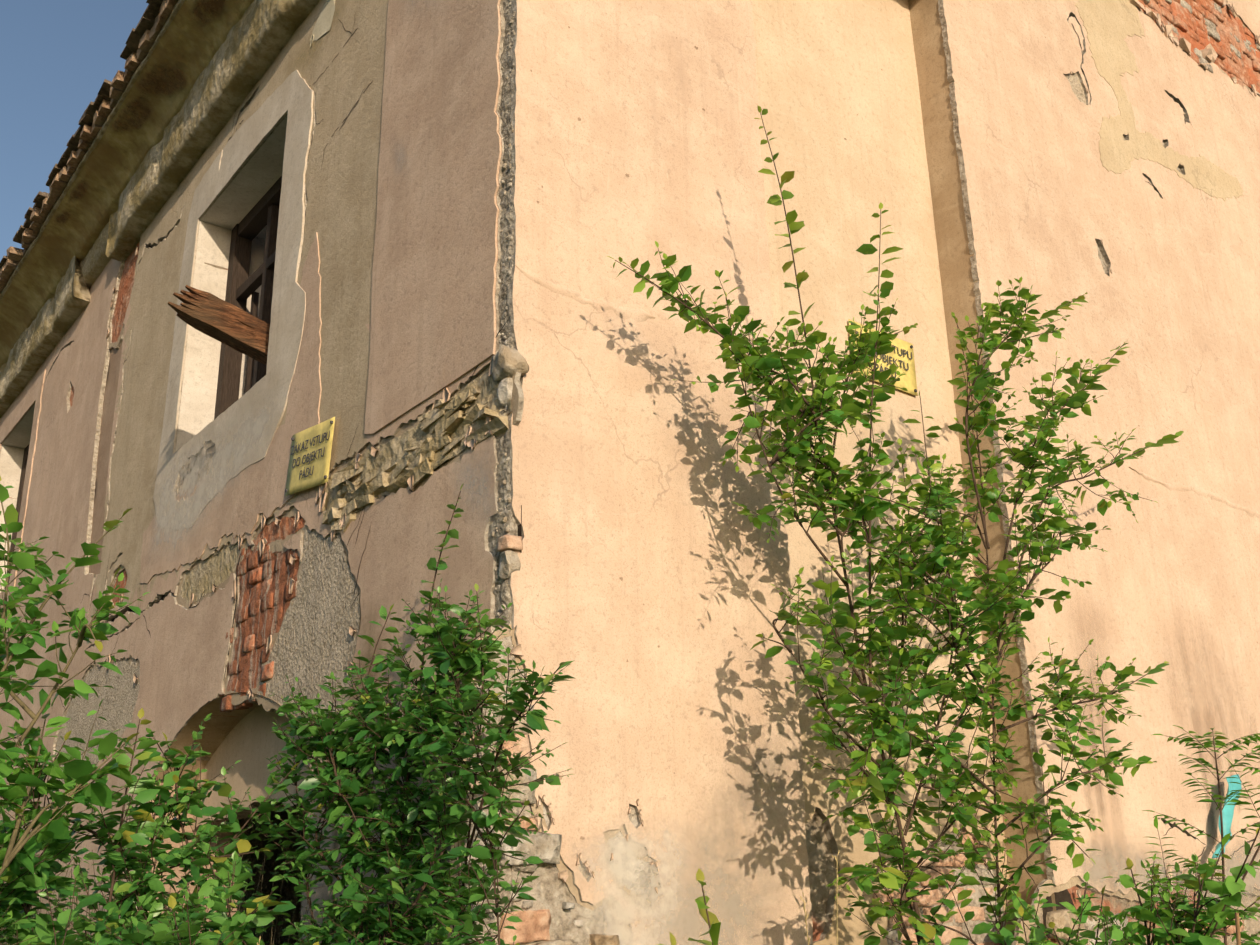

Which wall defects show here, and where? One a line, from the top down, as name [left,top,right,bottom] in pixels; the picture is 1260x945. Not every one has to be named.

peeling [1075,0,1260,201]
peeling [106,242,140,350]
flaking render [175,0,658,945]